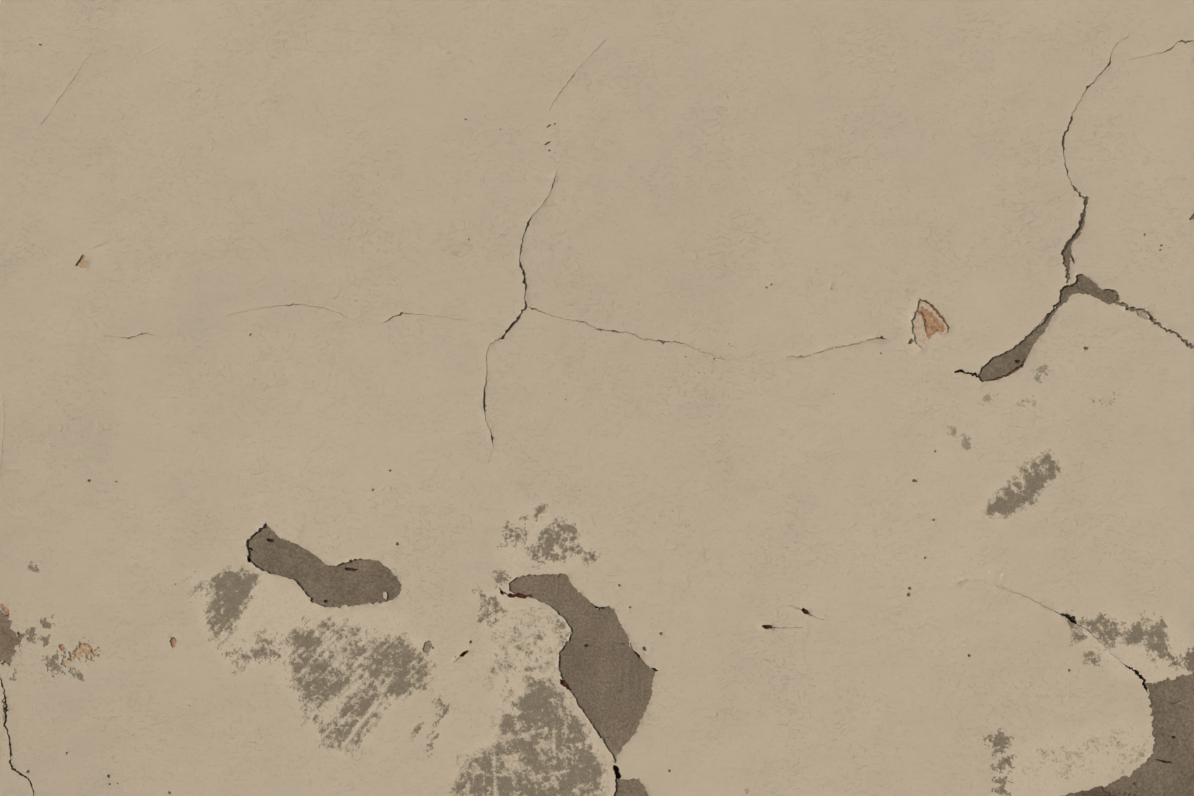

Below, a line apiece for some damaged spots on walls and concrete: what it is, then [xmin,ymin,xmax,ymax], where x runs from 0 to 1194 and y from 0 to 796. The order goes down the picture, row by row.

crack [483,41,724,465]
peeling [908,298,950,349]
crack [954,36,1194,382]
peeling [980,449,1063,520]
crack [0,678,34,796]
spalling [0,604,101,681]
peeling [175,523,451,758]
peeling [445,503,658,796]
crack [957,580,1148,693]
spalling [983,610,1194,796]